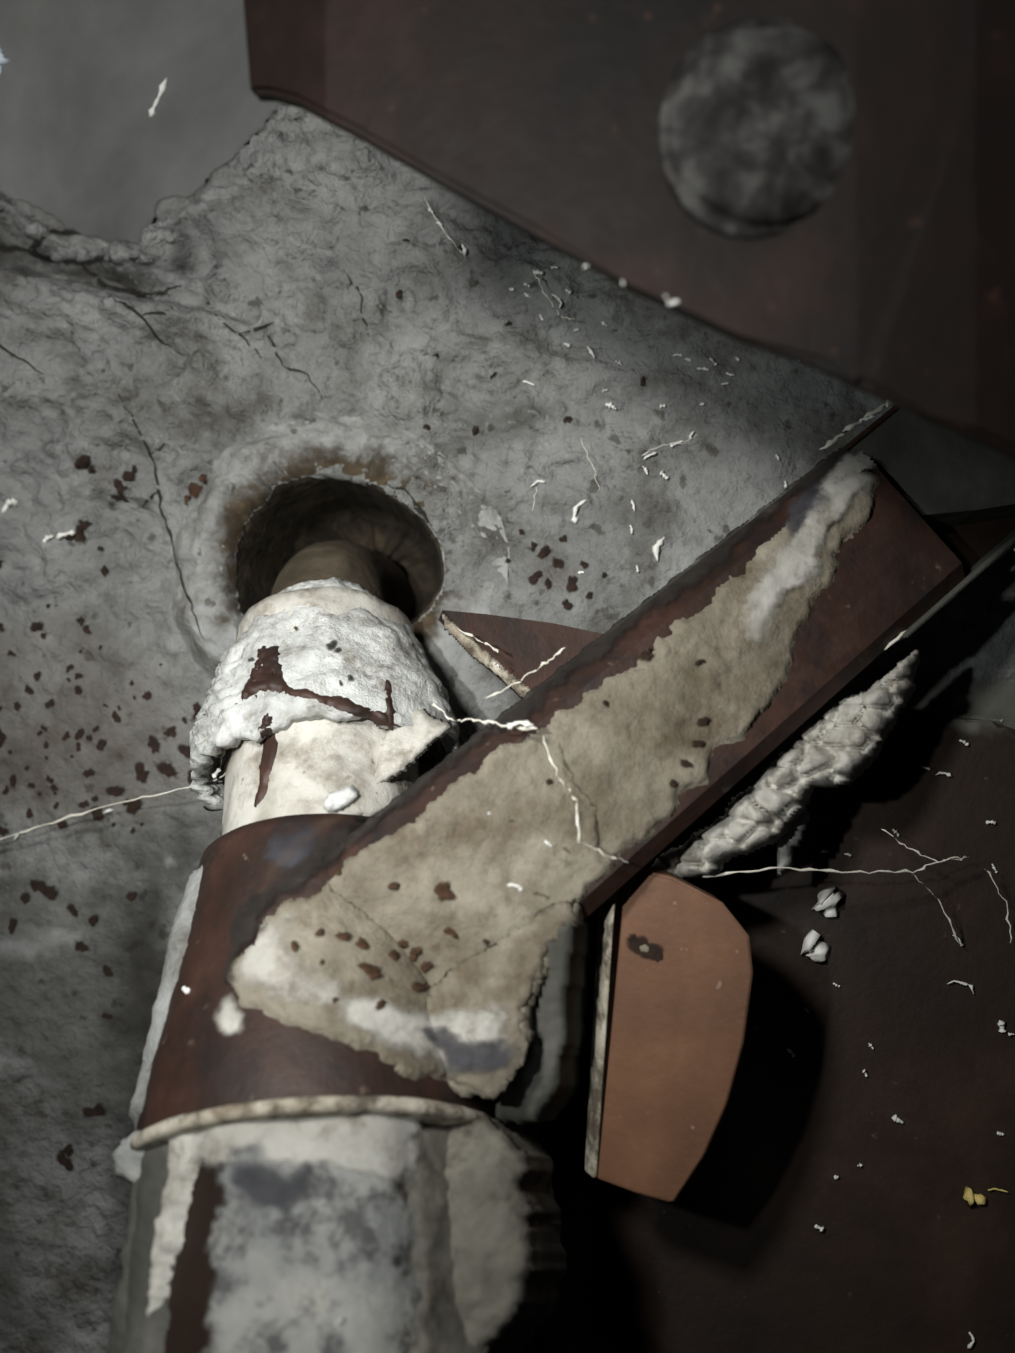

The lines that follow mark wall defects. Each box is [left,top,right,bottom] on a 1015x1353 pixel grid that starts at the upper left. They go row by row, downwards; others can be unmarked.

spalling [0,0,310,268]
crack [0,228,183,356]
crack [0,344,44,374]
crack [214,314,323,399]
corrosion [64,519,109,576]
crack [118,393,204,639]
corrosion [518,529,607,610]
corrosion [2,725,106,829]
corrosion [78,702,201,834]
corrosion [434,882,455,900]
corrosion [315,928,433,992]
corrosion [627,934,663,962]